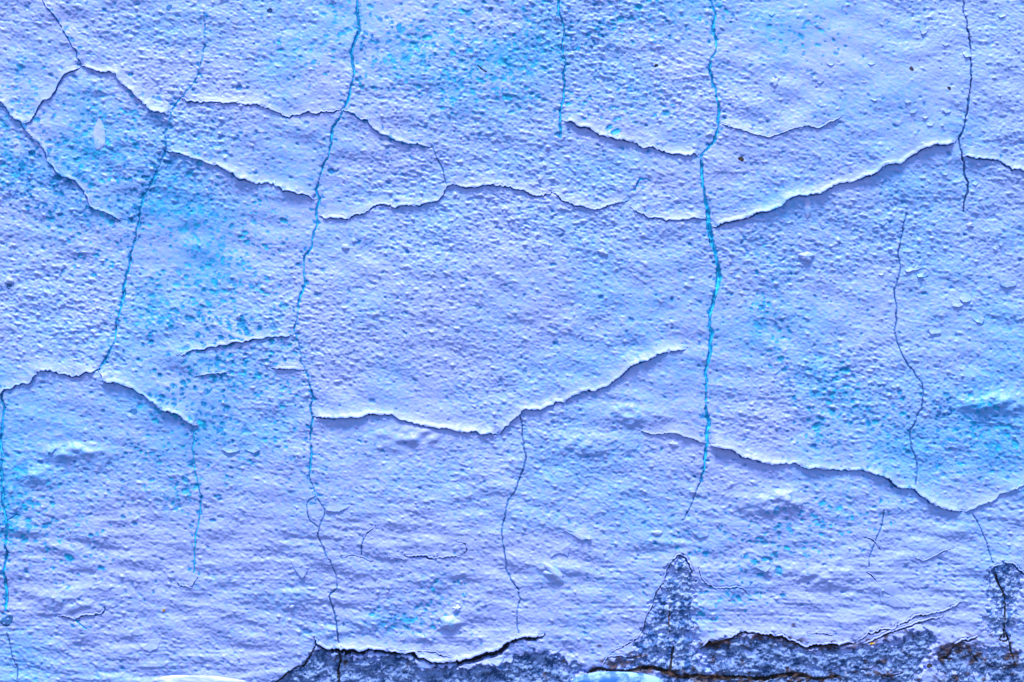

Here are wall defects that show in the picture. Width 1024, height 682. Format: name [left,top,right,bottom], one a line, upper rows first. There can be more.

crack [0,0,687,682]
spalling [272,647,587,682]
crack [557,0,1024,682]
spalling [610,556,1024,682]